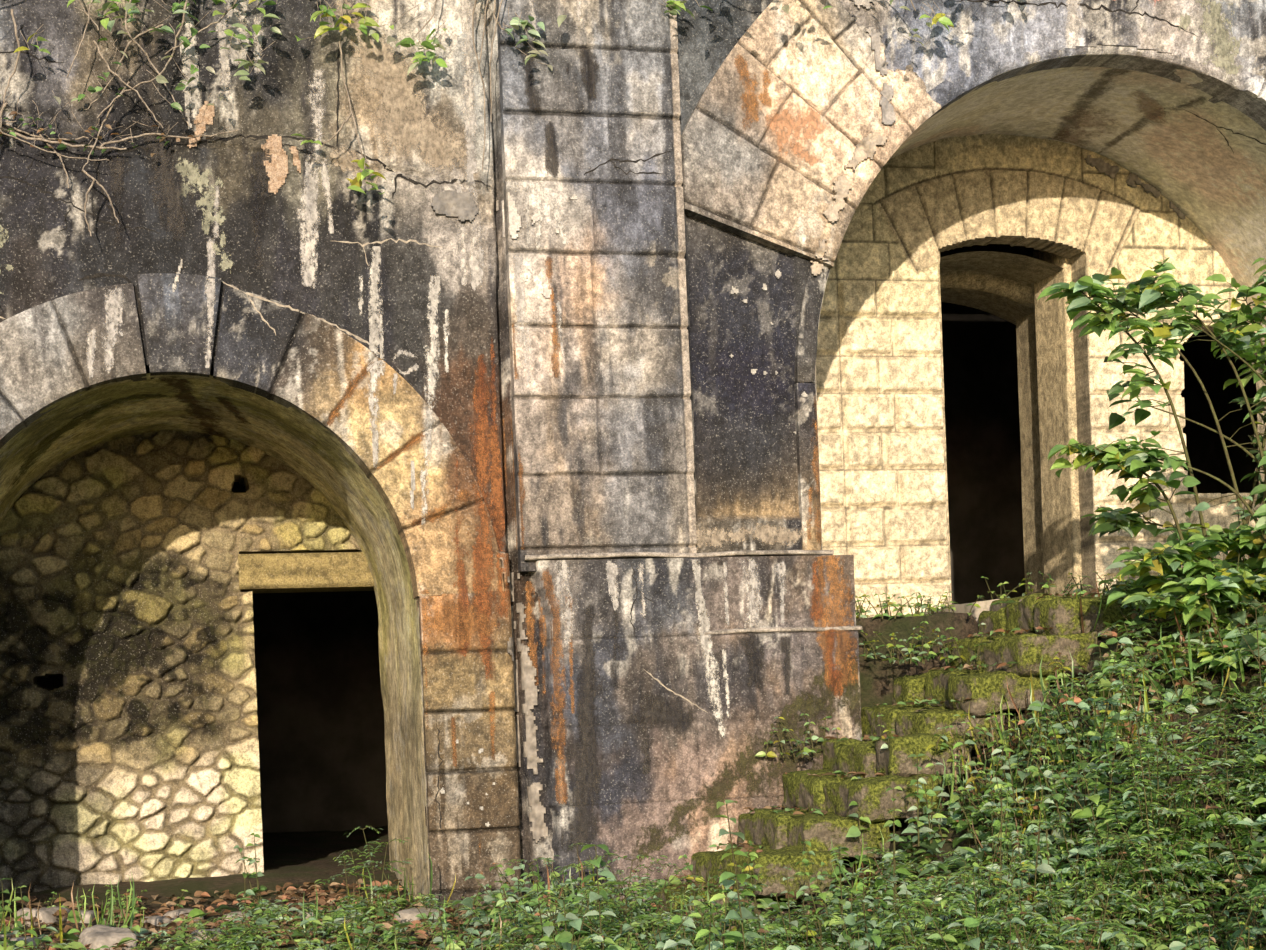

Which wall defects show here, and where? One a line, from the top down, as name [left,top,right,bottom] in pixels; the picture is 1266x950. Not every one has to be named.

crack [0,23,64,63]
spalling [176,101,215,149]
crack [0,44,491,233]
spalling [261,134,301,195]
leakage [298,70,334,288]
crack [957,0,1196,36]
leakage [87,288,123,377]
leakage [205,185,219,368]
corrosion [411,339,525,759]
corrosion [808,410,857,697]
corrosion [526,569,574,803]
leakage [691,559,730,737]